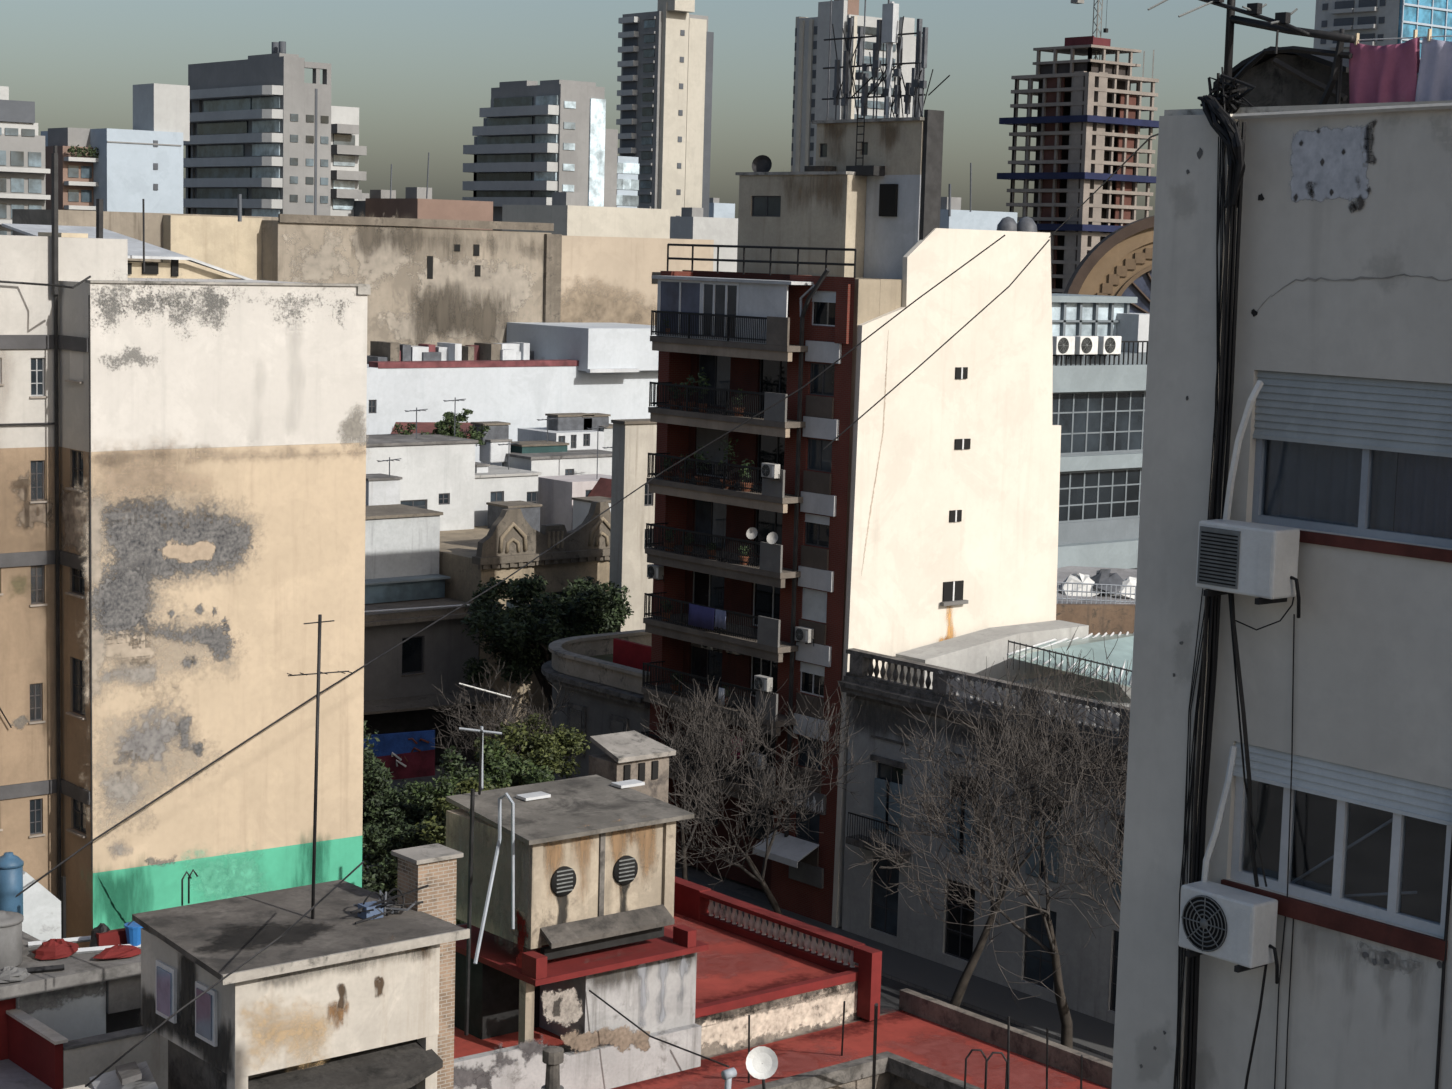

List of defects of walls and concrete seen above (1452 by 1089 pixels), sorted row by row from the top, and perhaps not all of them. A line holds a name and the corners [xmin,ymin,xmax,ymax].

peeling [1290,126,1370,212]
water stain [93,284,236,330]
crack [1257,274,1452,311]